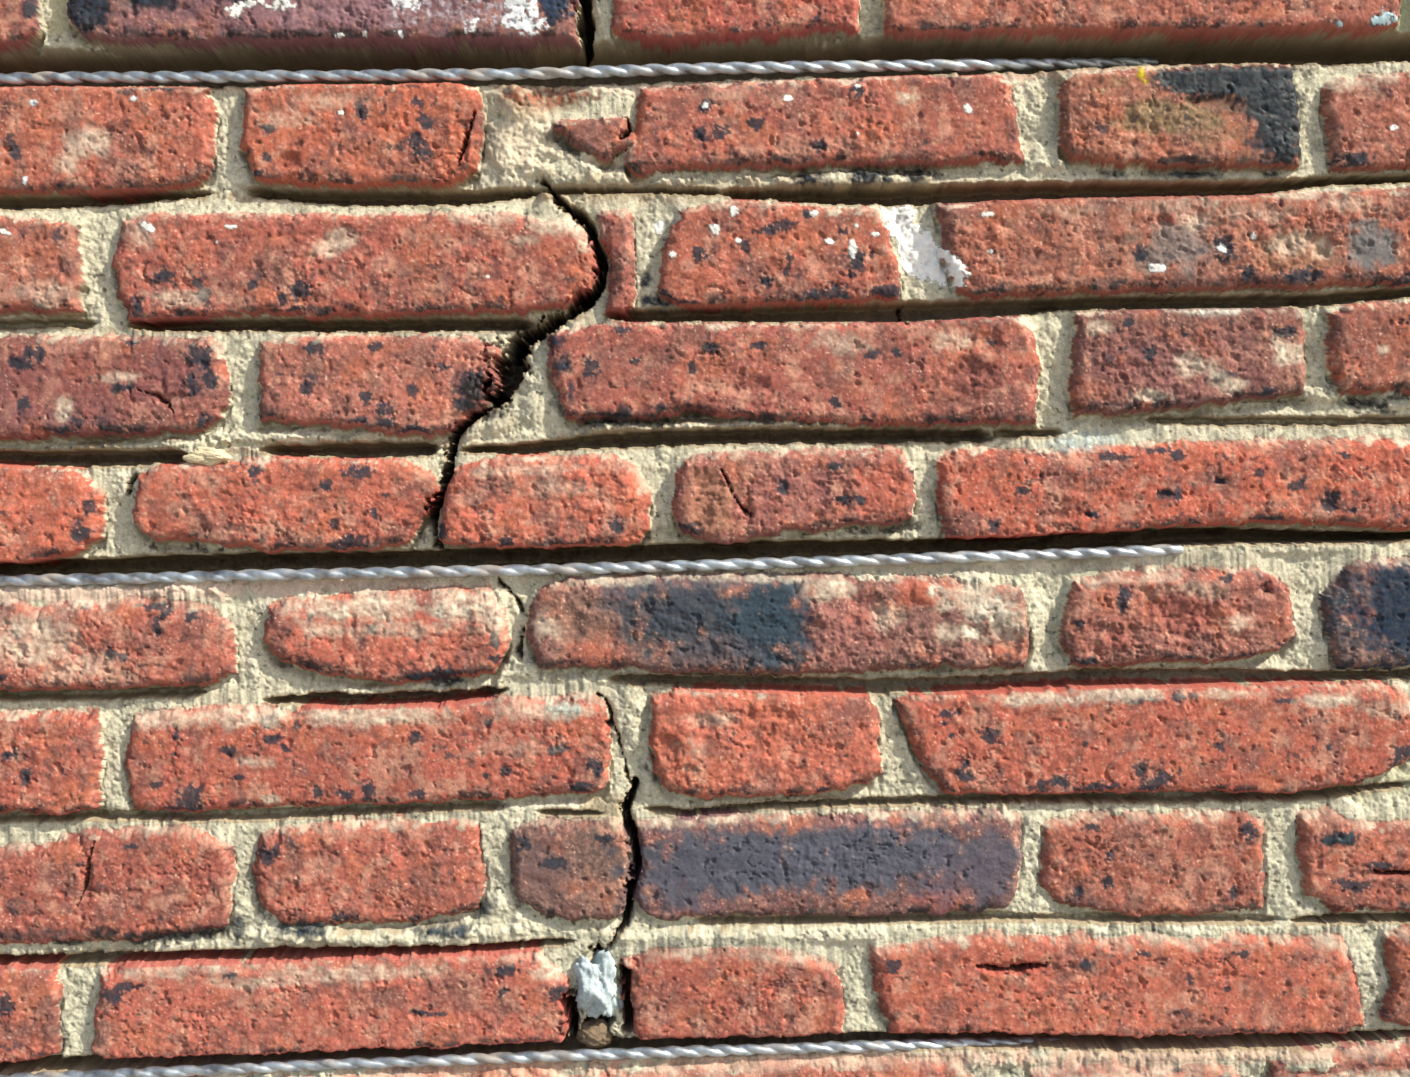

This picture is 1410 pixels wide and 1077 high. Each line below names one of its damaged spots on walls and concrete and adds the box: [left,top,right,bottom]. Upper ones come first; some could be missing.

crack [571,0,596,67]
crack [457,111,477,166]
crack [619,118,632,140]
crack [423,178,609,551]
crack [497,577,525,660]
crack [558,693,643,1050]